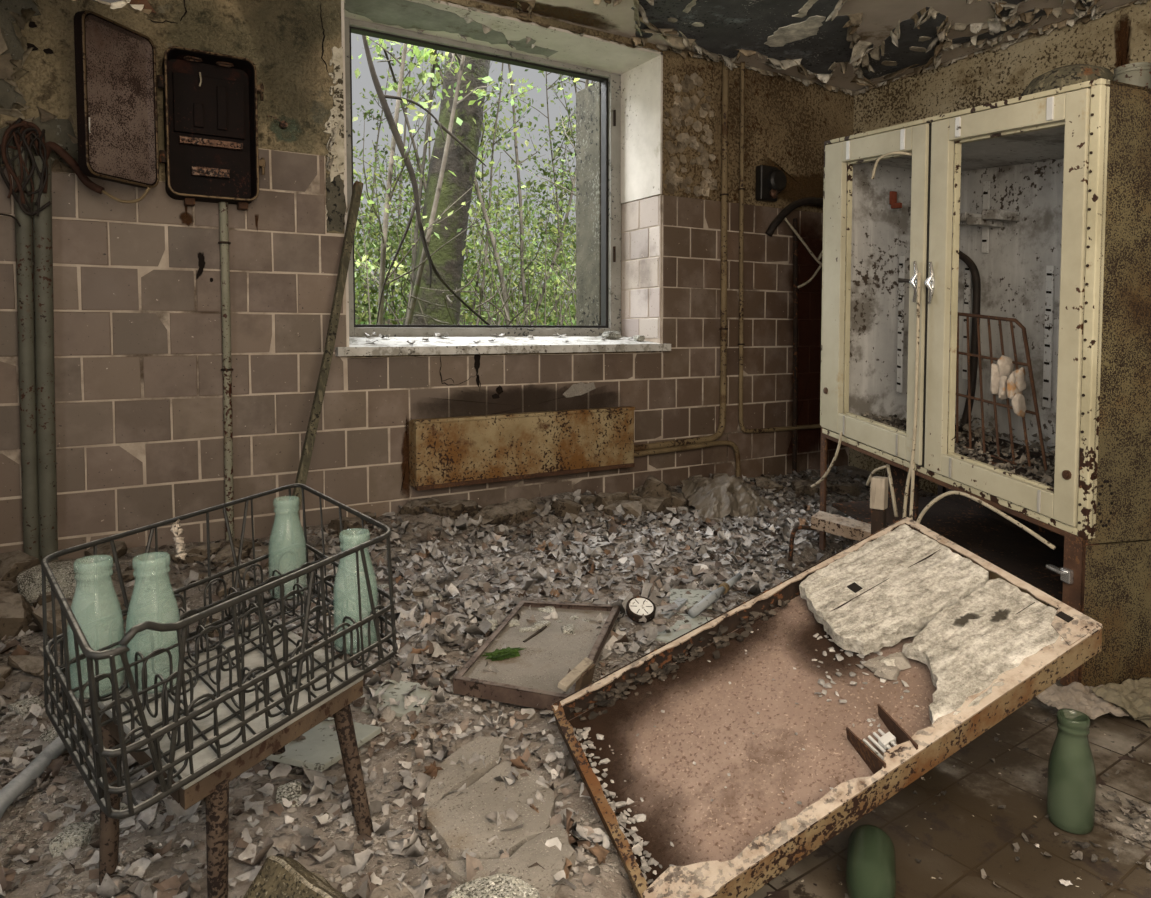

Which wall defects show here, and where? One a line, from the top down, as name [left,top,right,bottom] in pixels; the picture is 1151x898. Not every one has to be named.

peeling [95,0,152,14]
peeling [344,0,558,60]
spalling [0,0,78,174]
peeling [567,0,1148,197]
damp [764,158,824,209]